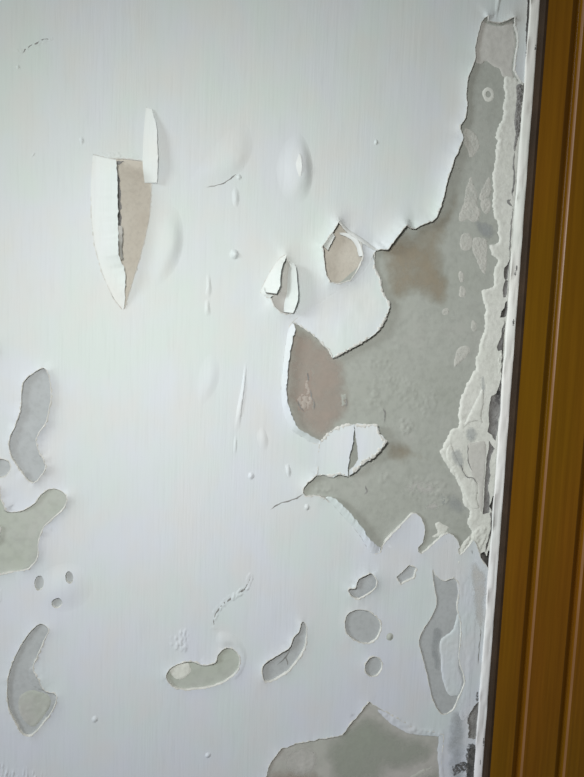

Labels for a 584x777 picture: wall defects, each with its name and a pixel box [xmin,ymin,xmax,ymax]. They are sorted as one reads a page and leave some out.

peeling [281,15,524,570]
peeling [0,367,53,483]
peeling [0,488,68,576]
peeling [6,624,57,737]
peeling [34,563,92,612]
peeling [166,631,247,691]
peeling [261,622,308,683]
peeling [344,572,382,644]
peeling [364,656,383,677]
peeling [418,570,465,715]
peeling [266,701,445,777]